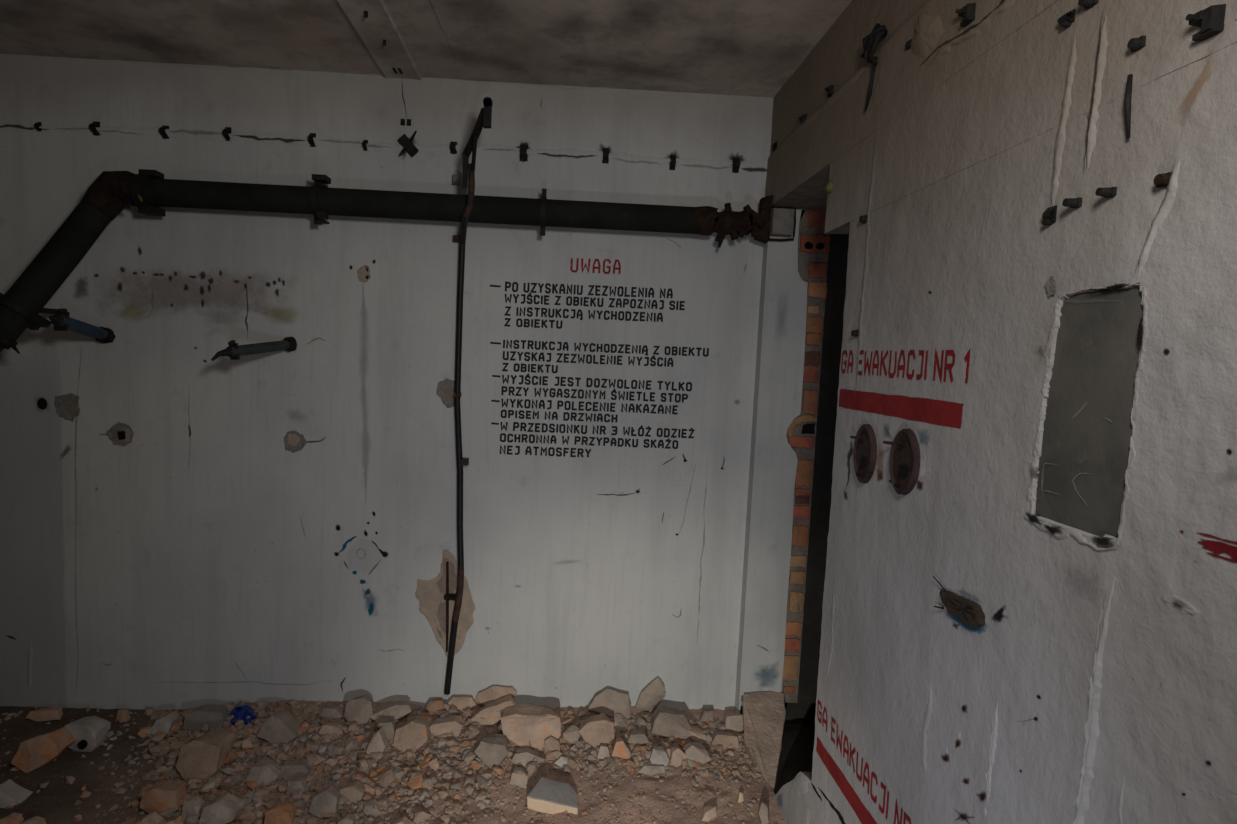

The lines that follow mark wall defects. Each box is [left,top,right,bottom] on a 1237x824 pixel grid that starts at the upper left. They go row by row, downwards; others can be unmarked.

spalling [54,393,80,422]
spalling [436,378,455,408]
spalling [106,422,134,447]
spalling [284,430,327,453]
spalling [415,549,475,657]
crack [811,783,845,824]